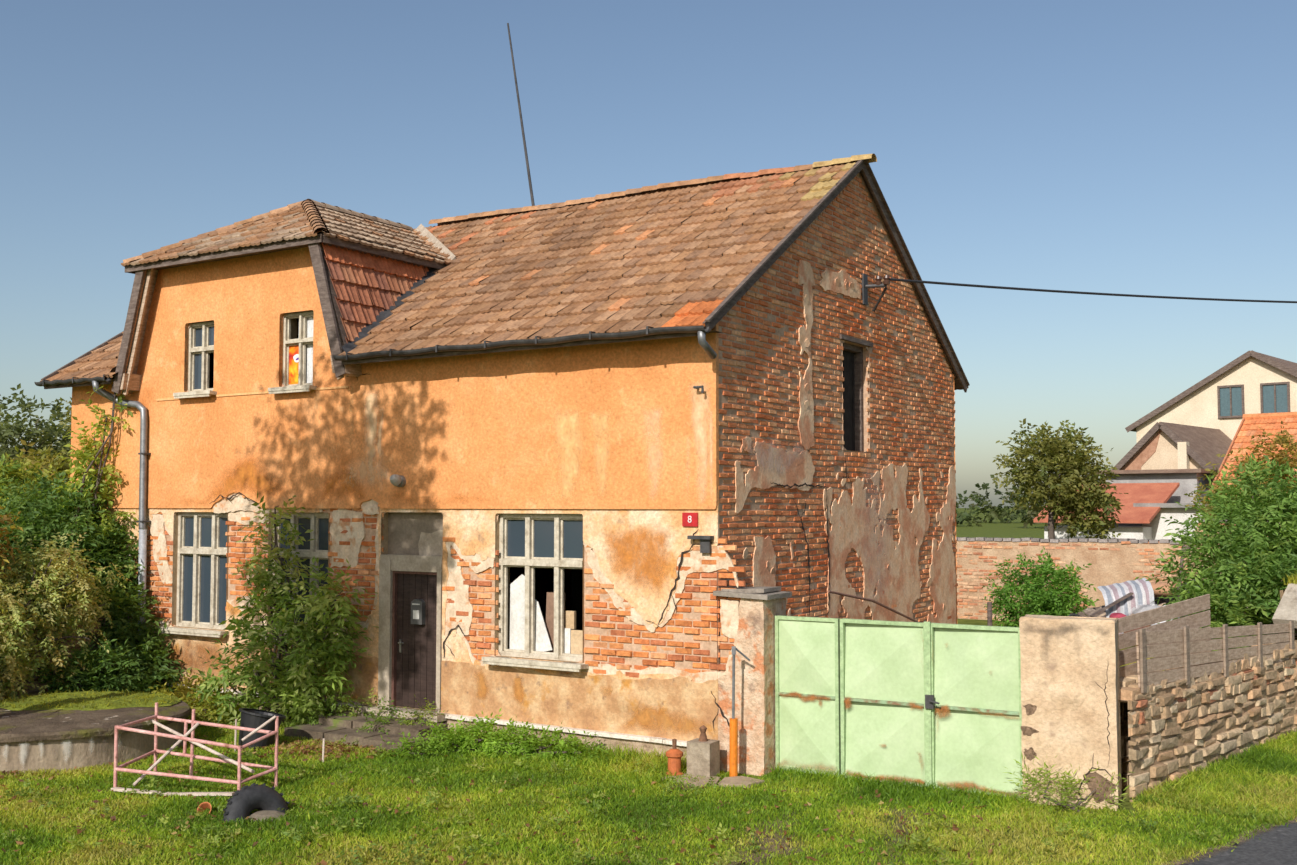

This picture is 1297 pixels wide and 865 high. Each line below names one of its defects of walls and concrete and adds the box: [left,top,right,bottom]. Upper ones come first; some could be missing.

peeling [734,260,956,624]
flaking render [121,512,174,627]
flaking render [213,492,278,611]
flaking render [319,493,384,633]
flaking render [442,537,511,670]
water stain [610,531,665,581]
crack [646,530,700,626]
flaking render [562,536,794,683]
rust [780,692,829,704]
rust [911,704,948,717]